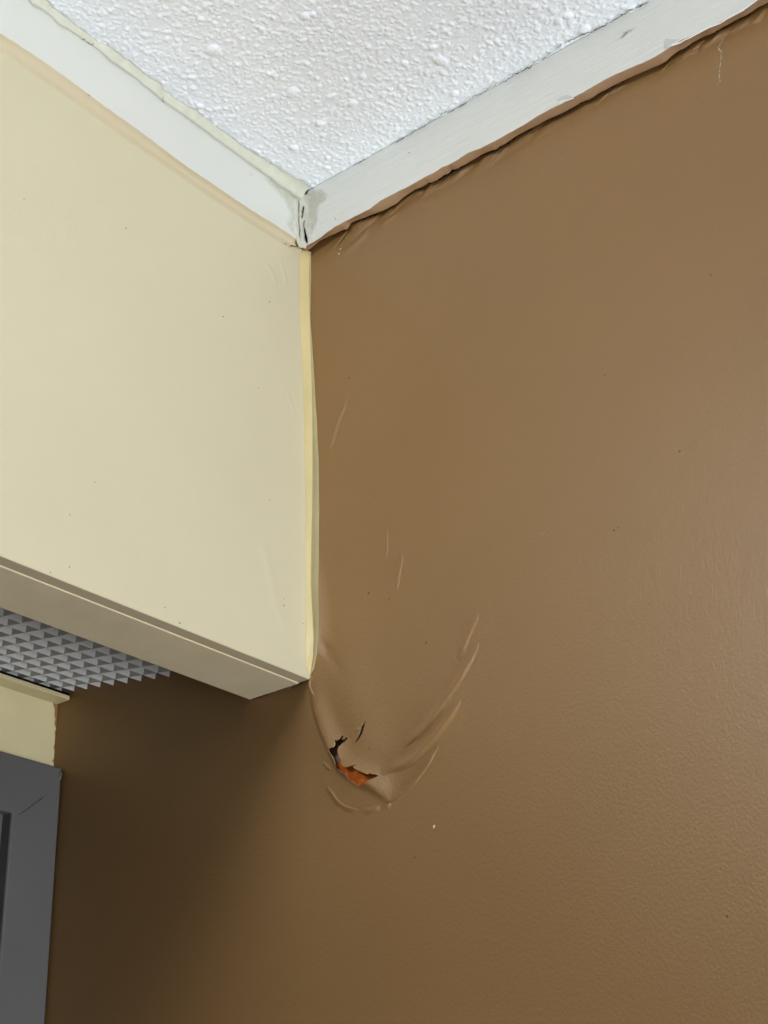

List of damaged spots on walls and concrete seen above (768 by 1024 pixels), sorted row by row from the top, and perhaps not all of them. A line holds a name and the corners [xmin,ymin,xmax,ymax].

spalling [664,0,757,49]
peeling [328,735,378,786]